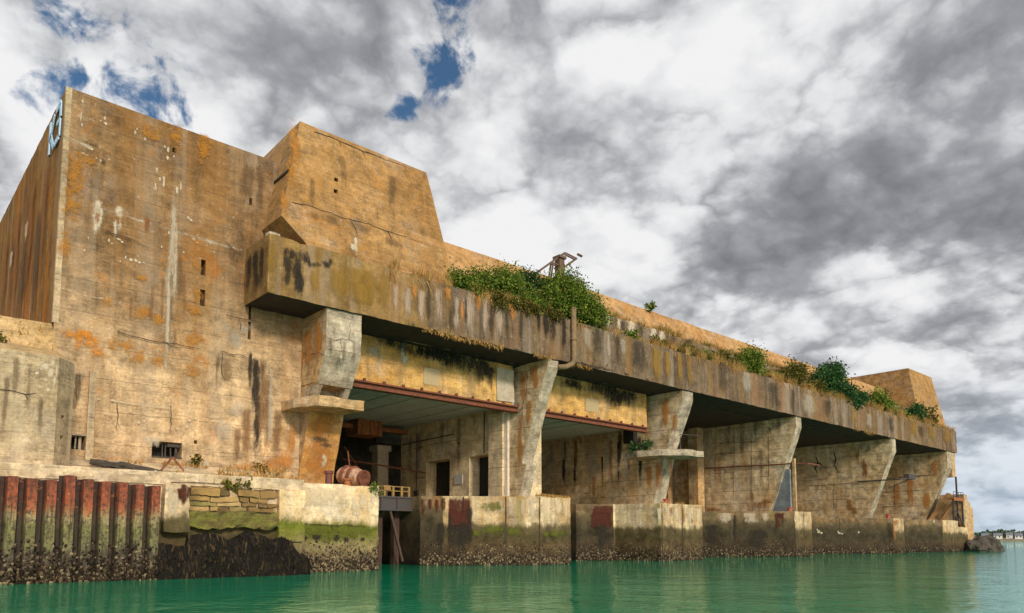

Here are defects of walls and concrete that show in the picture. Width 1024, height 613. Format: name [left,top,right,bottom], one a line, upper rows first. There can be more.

crack [292,202,419,242]
damp [166,209,188,351]
damp [246,248,523,336]
damp [378,338,496,388]
damp [248,352,260,454]
damp [565,379,636,408]
corrosion [421,498,471,530]
corrosion [592,505,613,529]